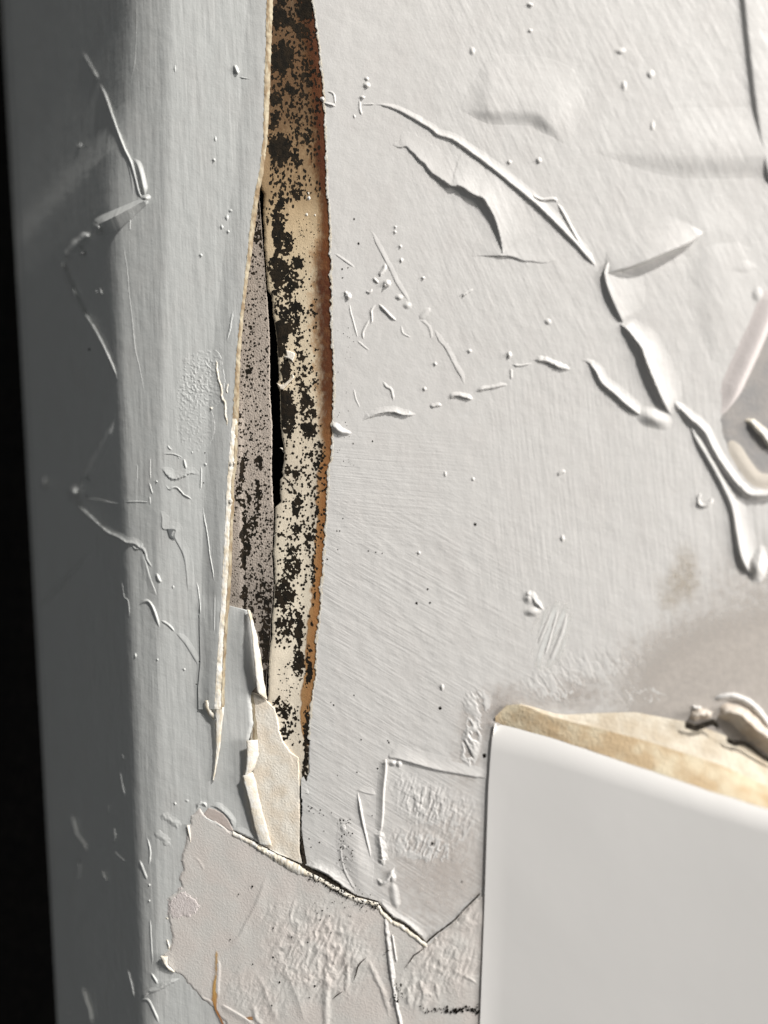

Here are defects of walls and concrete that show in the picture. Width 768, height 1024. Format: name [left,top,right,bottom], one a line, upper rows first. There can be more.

crack [221,0,355,799]
leakage [232,0,351,781]
crack [362,231,508,421]
spalling [720,290,768,489]
peeling [160,801,485,1024]
crack [232,824,480,998]